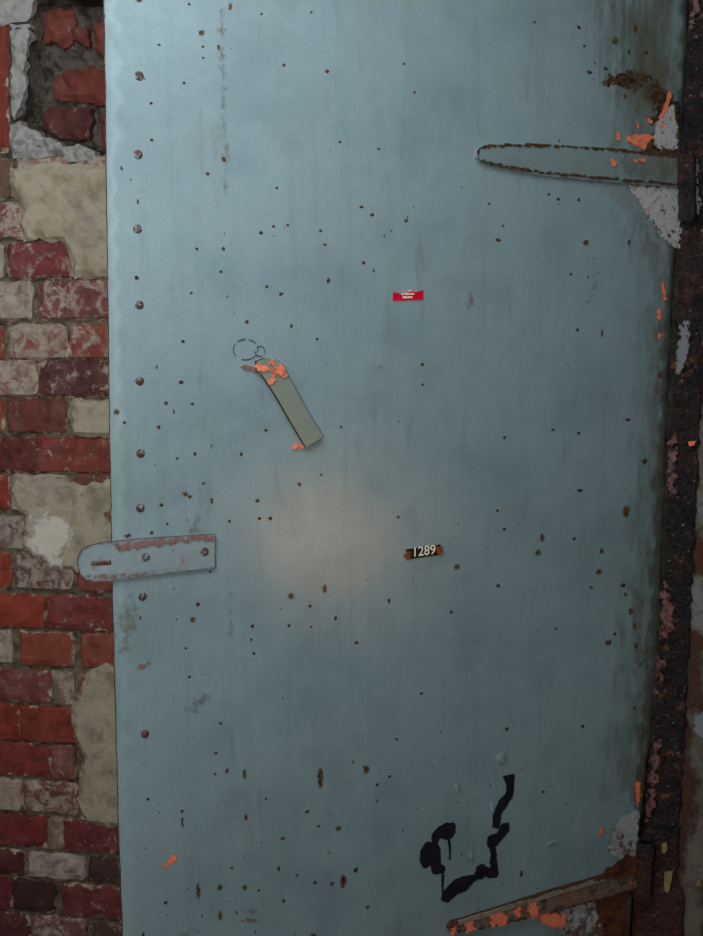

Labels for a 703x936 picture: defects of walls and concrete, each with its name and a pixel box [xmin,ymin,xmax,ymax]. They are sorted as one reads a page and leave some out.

peeling [689,0,700,29]
spalling [0,0,107,279]
corrosion [477,43,682,186]
peeling [616,91,679,163]
peeling [591,181,691,375]
corrosion [114,531,216,551]
peeling [593,379,679,882]
peeling [691,577,703,631]
corrosion [676,631,703,883]
peeling [420,774,515,903]
peeling [489,891,632,936]
peeling [664,871,672,893]